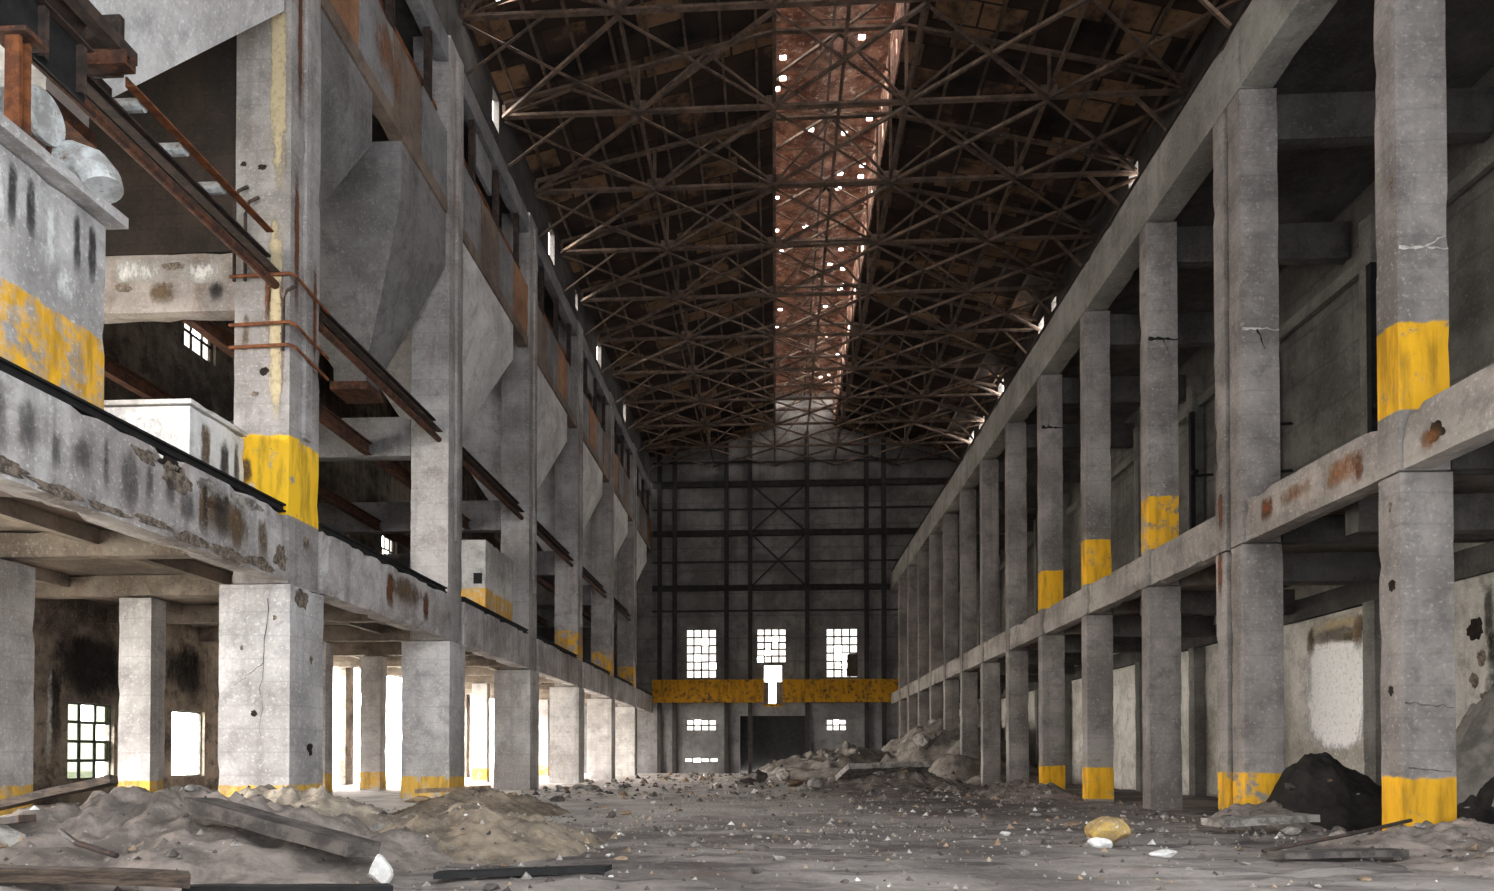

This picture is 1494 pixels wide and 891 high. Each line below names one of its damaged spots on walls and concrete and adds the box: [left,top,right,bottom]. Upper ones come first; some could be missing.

rust [1261,485,1307,519]
rust [1327,454,1362,485]
water stain [1484,590,1494,663]
flaking render [1307,623,1363,750]